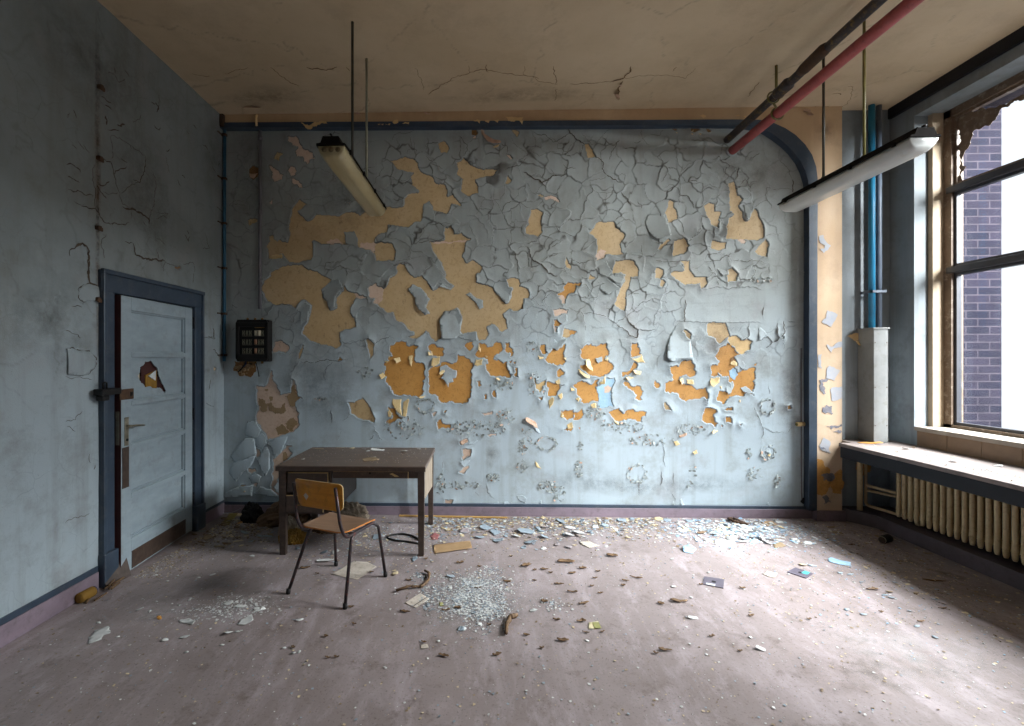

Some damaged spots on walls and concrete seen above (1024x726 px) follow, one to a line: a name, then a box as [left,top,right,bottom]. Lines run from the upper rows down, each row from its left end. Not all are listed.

crack [417,65,696,101]
crack [66,68,209,380]
peeling [526,194,559,237]
peeling [704,182,768,257]
peeling [249,117,534,429]
peeling [534,222,766,434]
flaking render [233,361,333,495]
flaking render [460,429,505,473]
peeling [817,459,844,496]